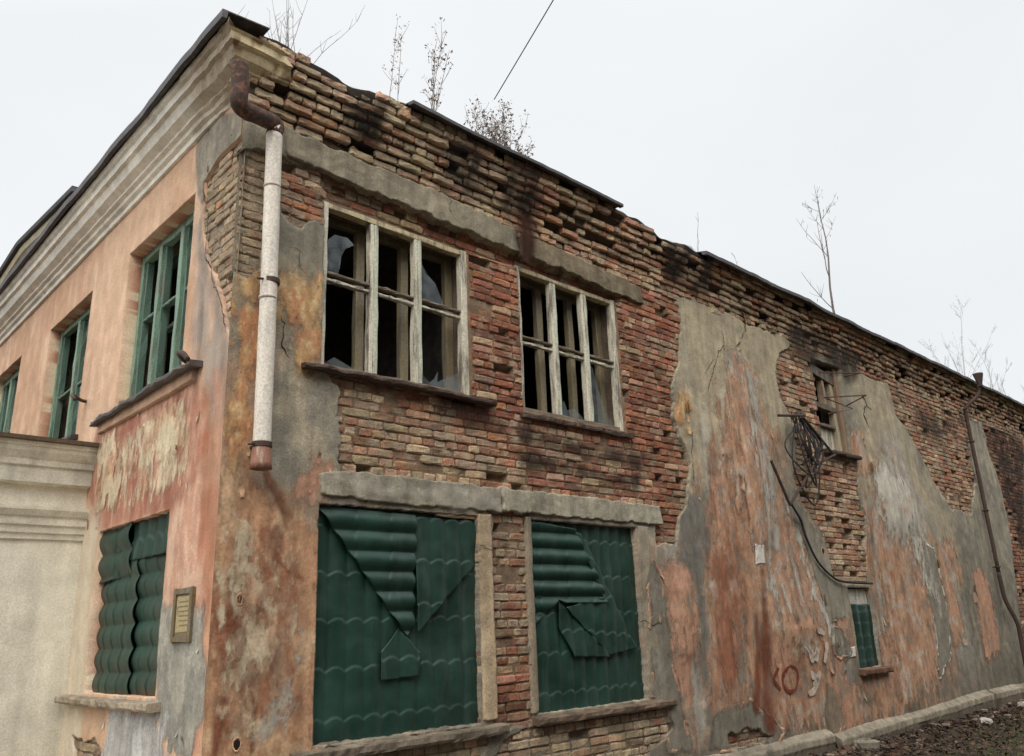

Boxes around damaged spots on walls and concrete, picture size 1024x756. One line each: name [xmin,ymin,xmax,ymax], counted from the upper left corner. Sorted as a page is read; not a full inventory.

crack [203,191,227,333]
flaking render [73,140,1000,756]
crack [704,310,746,434]
flaking render [979,420,1024,640]